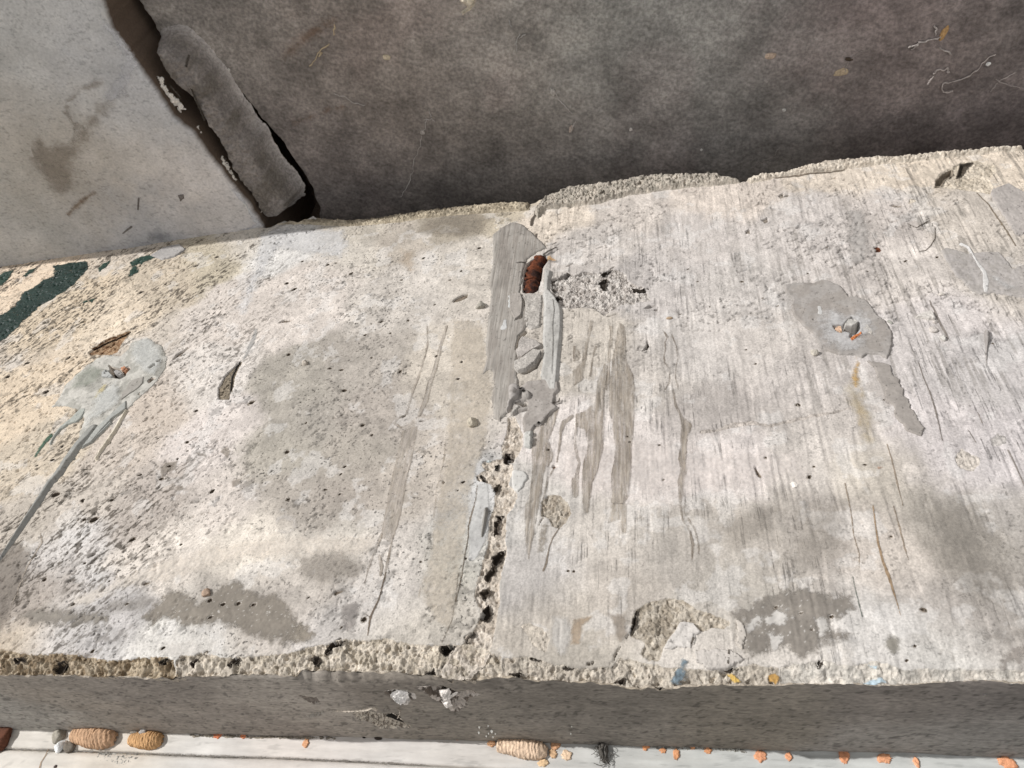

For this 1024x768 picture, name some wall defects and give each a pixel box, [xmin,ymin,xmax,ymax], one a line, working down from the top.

spalling [278,145,1023,227]
rust [516,242,557,294]
spalling [509,269,651,374]
water stain [142,582,315,643]
spalling [0,550,1024,712]
water stain [732,588,855,658]